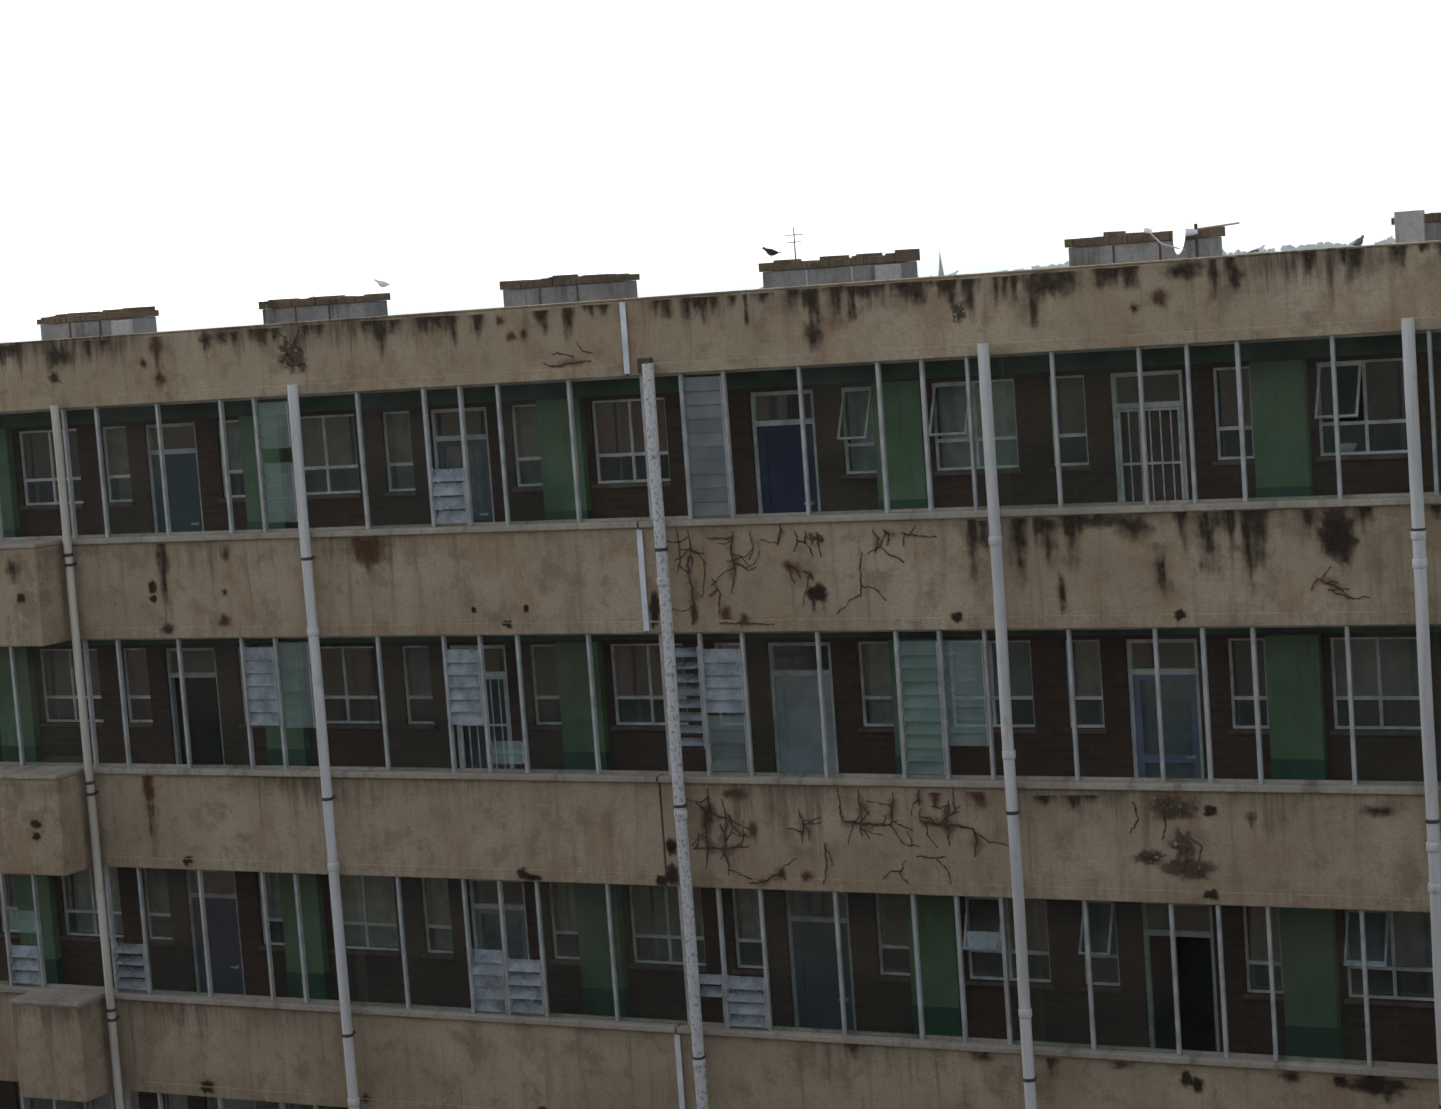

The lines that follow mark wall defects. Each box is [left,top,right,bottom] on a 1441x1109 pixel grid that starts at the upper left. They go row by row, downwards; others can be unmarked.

damp [360,315,455,350]
crack [543,342,593,367]
damp [653,281,932,345]
damp [993,271,1075,324]
damp [1167,257,1244,290]
corrosion [353,537,382,567]
crack [667,524,814,625]
crack [837,525,937,614]
damp [1012,514,1149,568]
damp [1174,510,1267,577]
crack [1311,566,1370,599]
crack [686,787,1009,885]